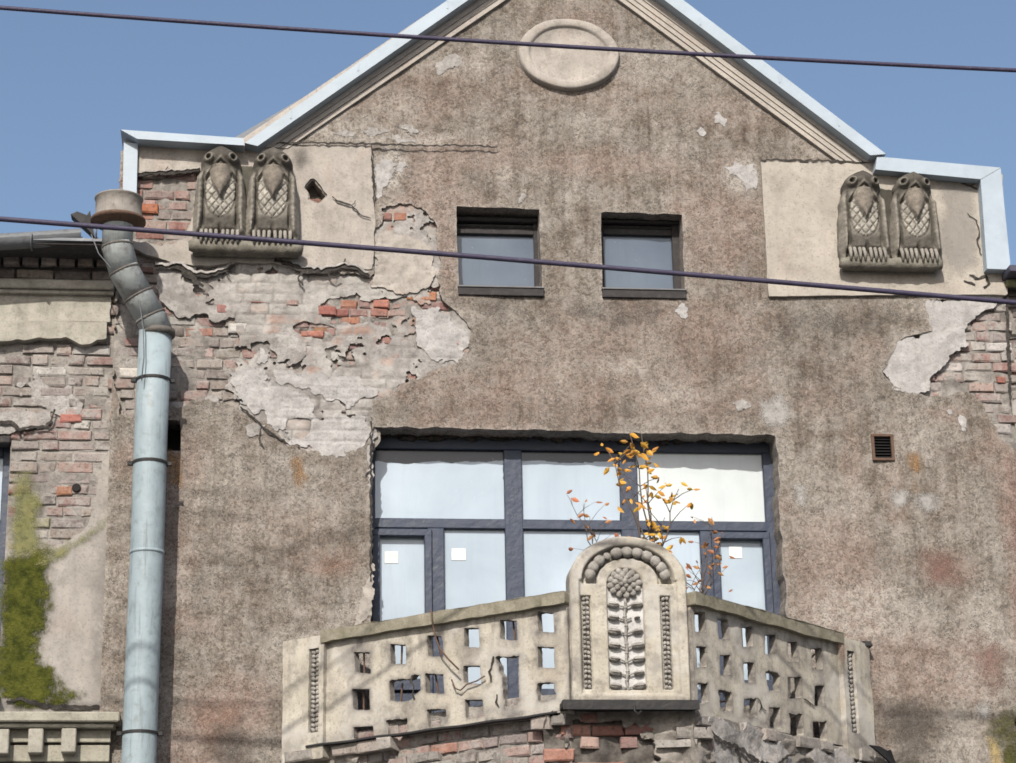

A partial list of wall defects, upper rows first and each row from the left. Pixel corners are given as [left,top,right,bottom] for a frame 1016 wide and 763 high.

crack [276,141,498,219]
flaking render [724,162,758,191]
flaking render [108,289,139,422]
flaking render [133,159,471,488]
flaking render [882,296,1016,449]
crack [964,213,1016,400]
flaking render [707,716,792,763]
flaking render [805,748,869,763]